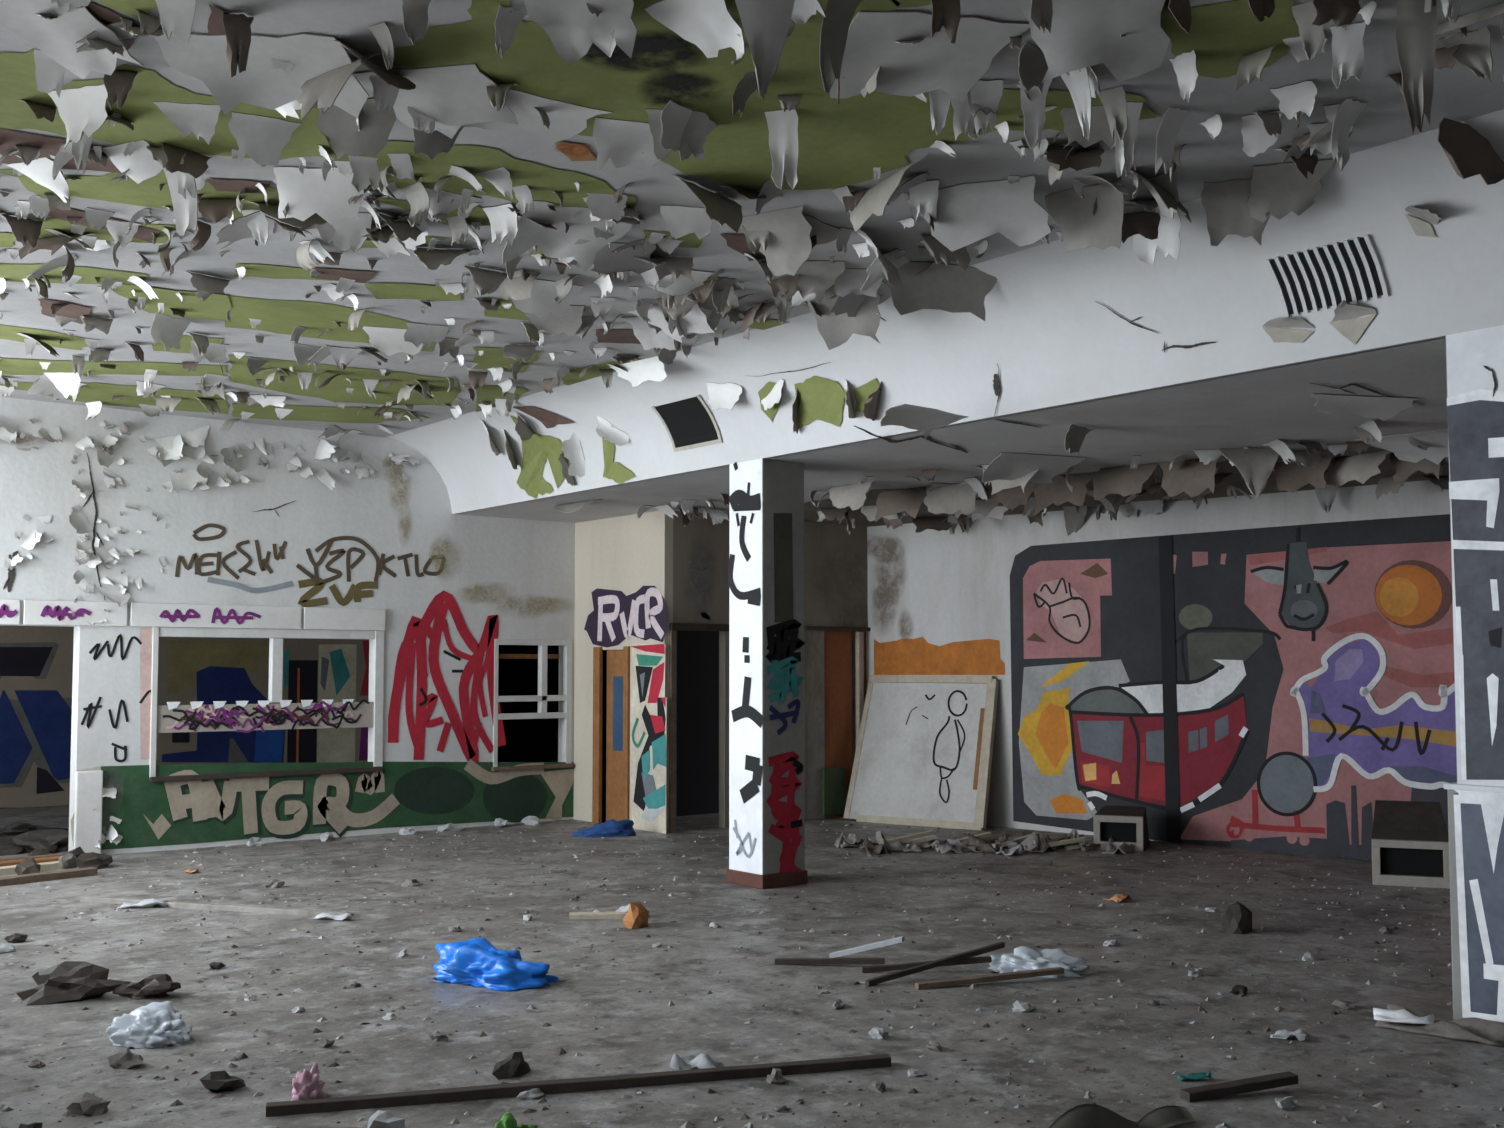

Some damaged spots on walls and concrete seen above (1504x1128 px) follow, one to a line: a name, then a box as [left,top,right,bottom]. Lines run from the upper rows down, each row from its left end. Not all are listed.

peeling [0,0,1449,625]
peeling [1386,0,1504,185]